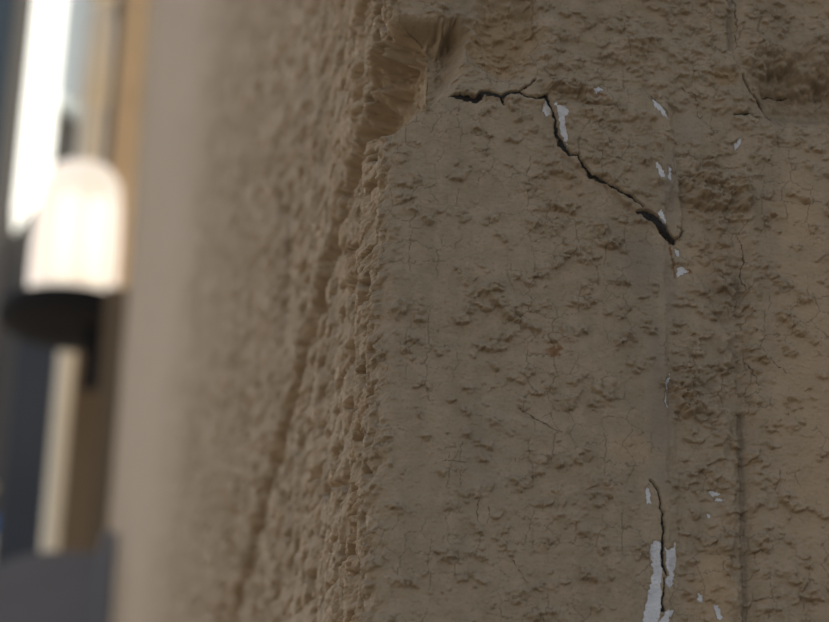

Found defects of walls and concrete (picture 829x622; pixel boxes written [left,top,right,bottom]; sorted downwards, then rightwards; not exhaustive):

peeling [542,100,569,145]
crack [450,81,683,244]
crack [650,481,667,612]
peeling [642,541,676,622]